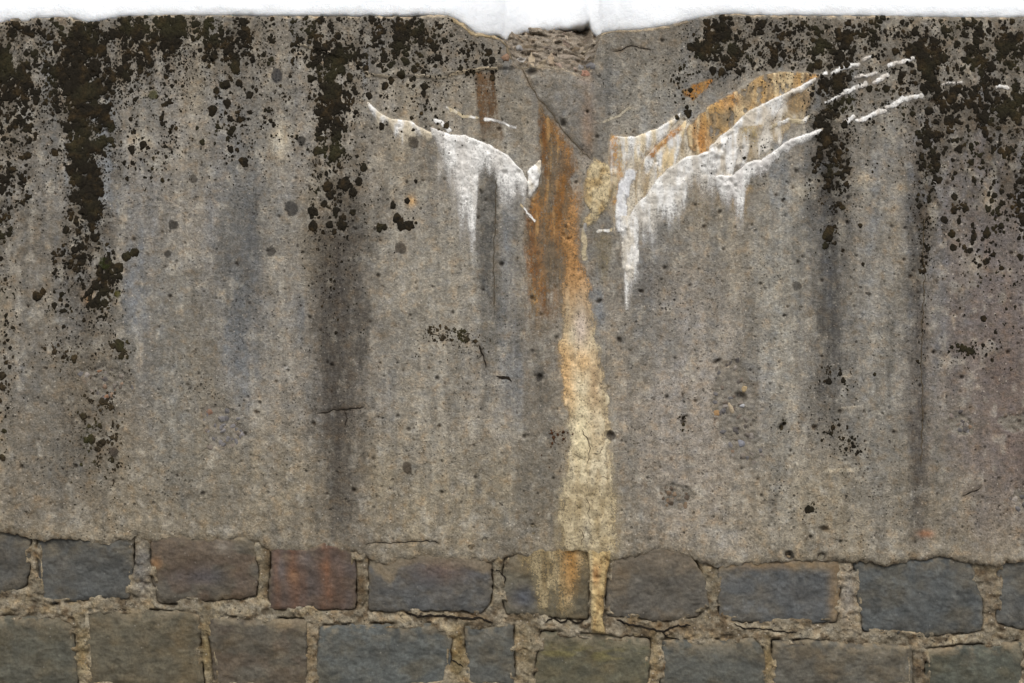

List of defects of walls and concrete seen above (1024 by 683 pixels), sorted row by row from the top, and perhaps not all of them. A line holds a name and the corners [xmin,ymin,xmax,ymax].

leakage [367,102,541,243]
corrosion [526,106,576,323]
crack [520,67,591,159]
leakage [518,56,924,634]